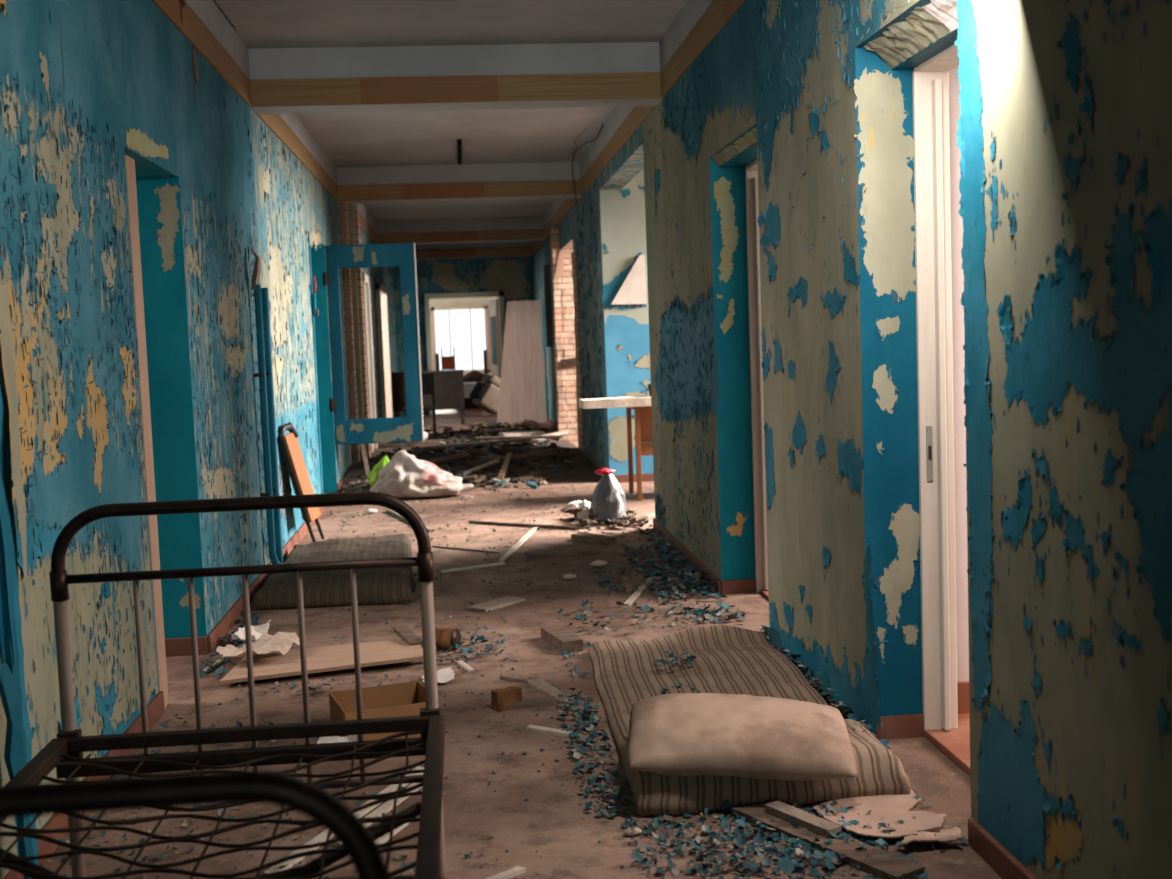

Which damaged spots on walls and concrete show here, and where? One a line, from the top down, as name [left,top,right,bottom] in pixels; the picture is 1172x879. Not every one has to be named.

flaking render [153,77,322,626]
flaking render [343,268,355,417]
peeling [370,267,396,415]
flaking render [432,259,528,301]
peeling [554,0,1172,872]
flaking render [0,817,18,856]